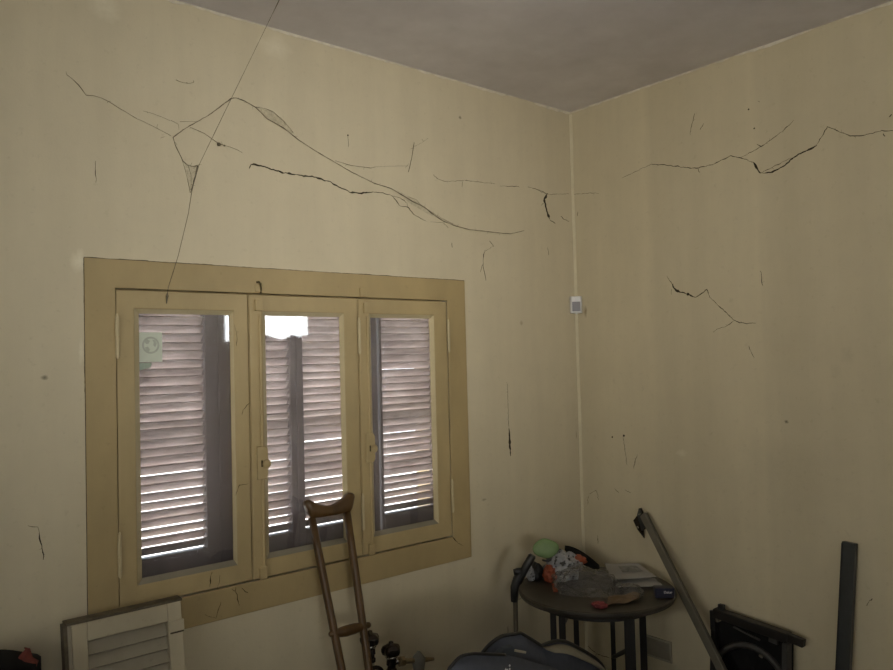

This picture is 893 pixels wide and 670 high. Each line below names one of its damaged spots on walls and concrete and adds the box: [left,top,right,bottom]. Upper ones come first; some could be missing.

crack [627,109,893,176]
crack [249,163,425,221]
crack [436,177,599,223]
crack [667,277,749,330]